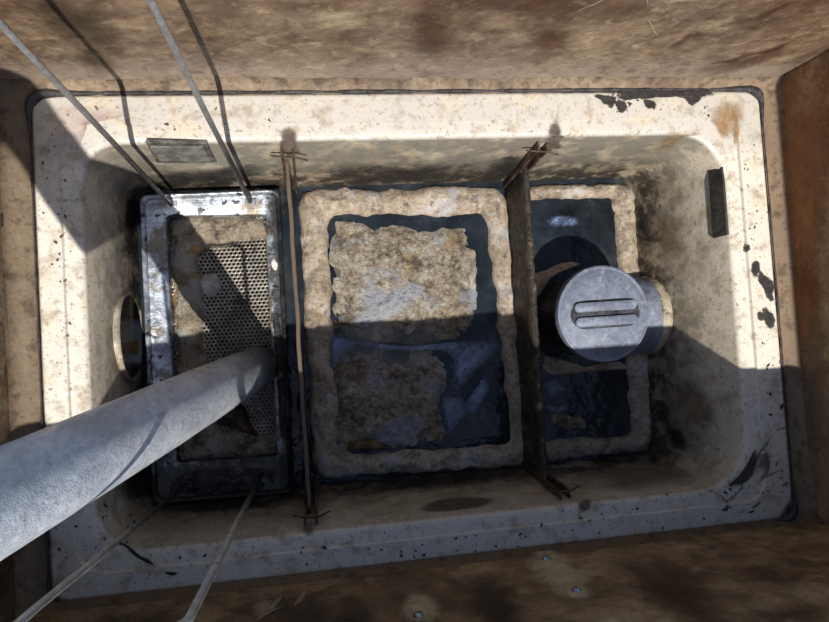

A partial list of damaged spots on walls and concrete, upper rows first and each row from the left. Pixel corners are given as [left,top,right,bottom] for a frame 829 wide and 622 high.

damp [39,2,103,42]
corrosion [281,129,299,156]
corrosion [786,99,829,368]
damp [424,497,490,510]
damp [529,551,588,599]
damp [403,595,437,621]